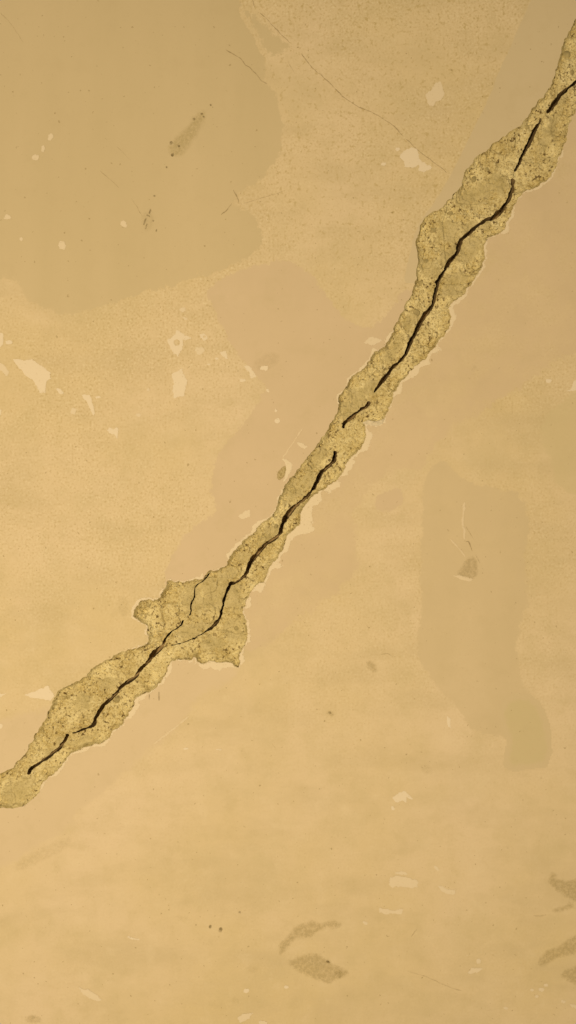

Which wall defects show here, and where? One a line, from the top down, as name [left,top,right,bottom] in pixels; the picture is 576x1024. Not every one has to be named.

flaking render [0,19,576,810]
crack [27,80,576,775]